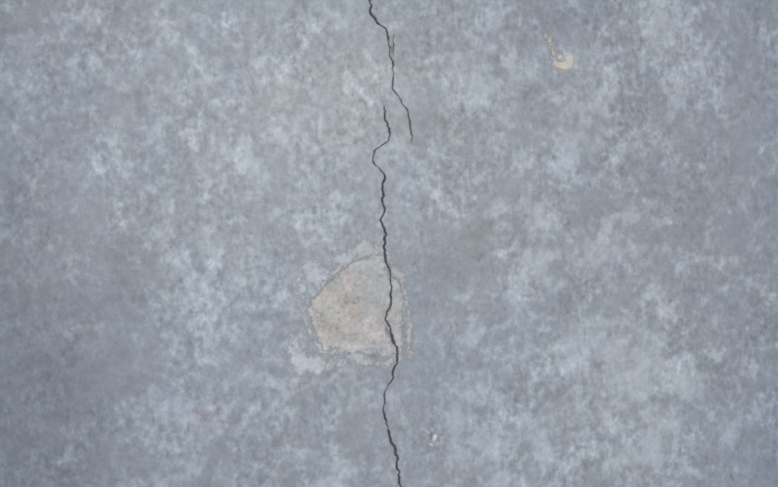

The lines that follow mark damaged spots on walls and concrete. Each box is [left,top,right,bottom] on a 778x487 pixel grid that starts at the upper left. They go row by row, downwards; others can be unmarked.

spalling [283,239,415,377]
crack [366,0,416,487]